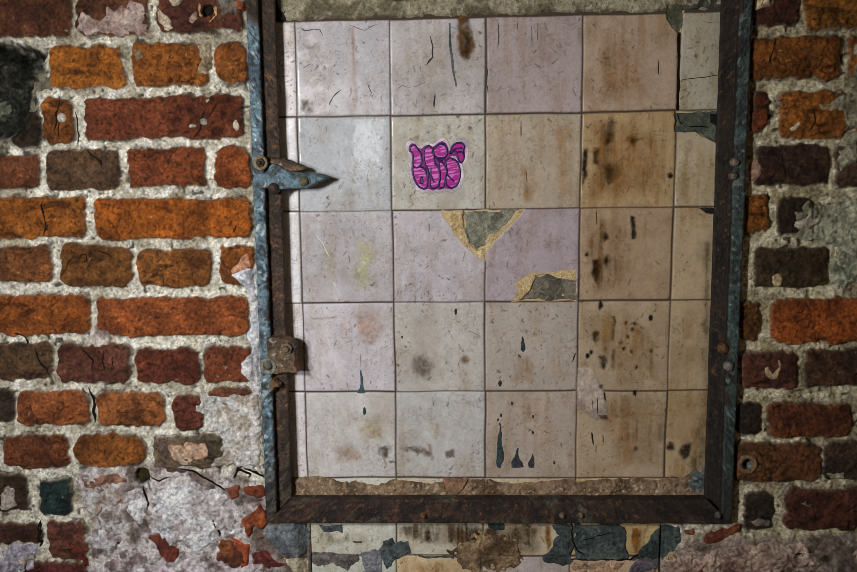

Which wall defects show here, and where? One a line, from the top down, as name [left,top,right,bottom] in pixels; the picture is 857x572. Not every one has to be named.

rust [457,15,475,59]
water stain [0,43,47,157]
peeling [819,88,857,171]
spalling [443,208,524,260]
flaking render [794,198,857,289]
spalling [514,270,577,301]
crack [142,466,264,511]
flaking render [154,392,524,572]
crack [36,520,44,547]
spalling [71,544,89,567]
spalling [148,533,179,563]
flaking render [542,518,823,572]